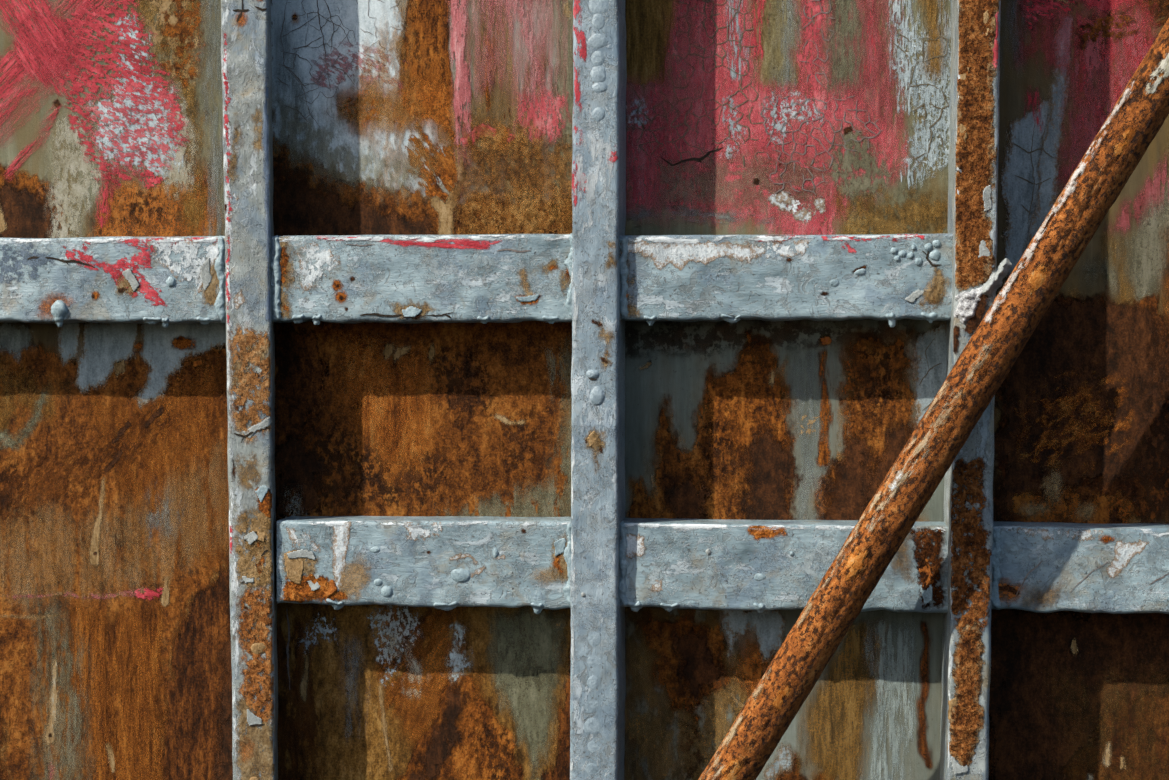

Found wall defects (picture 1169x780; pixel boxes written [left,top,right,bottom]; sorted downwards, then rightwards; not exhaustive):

peeling [51,0,450,593]
rust [0,0,572,780]
crack [233,0,404,130]
peeling [620,239,809,270]
rust [627,328,917,539]
crack [628,0,949,197]
peeling [764,92,826,142]
peeling [768,191,826,223]
rust [836,0,1000,309]
rust [896,251,1169,780]
peeling [985,14,1169,322]
rust [624,607,768,780]